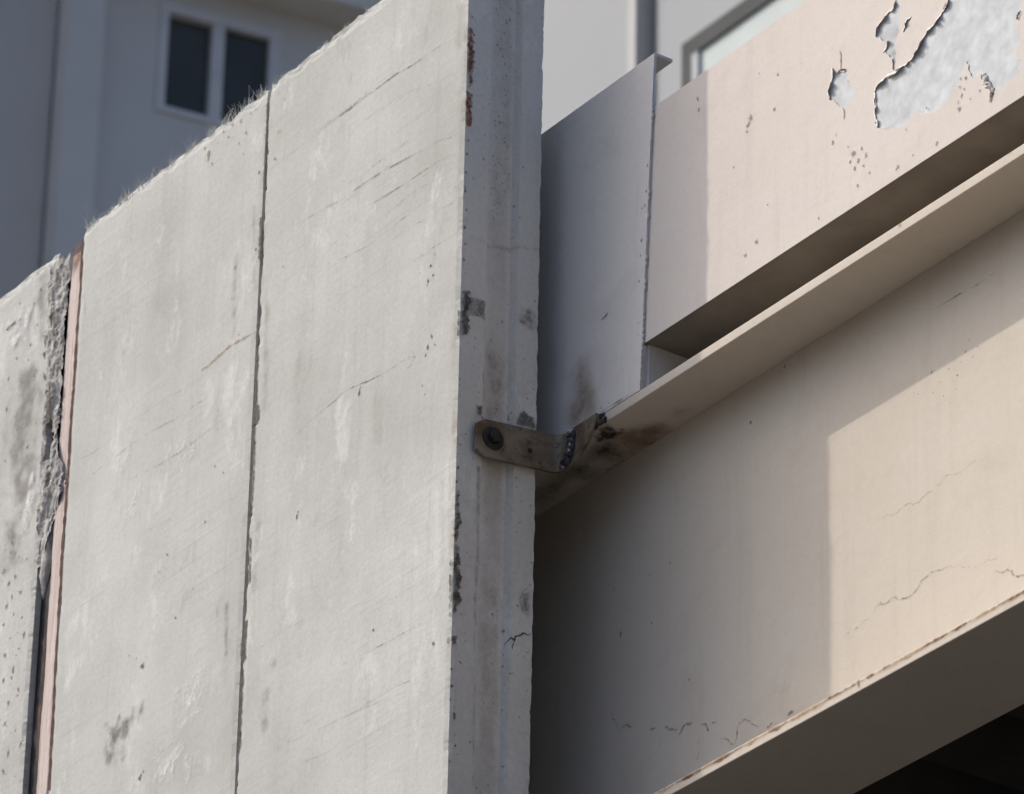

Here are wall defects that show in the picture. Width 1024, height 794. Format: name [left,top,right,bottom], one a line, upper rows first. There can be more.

corrosion [466,28,475,126]
peeling [827,53,856,119]
peeling [873,0,1022,130]
spalling [33,253,71,569]